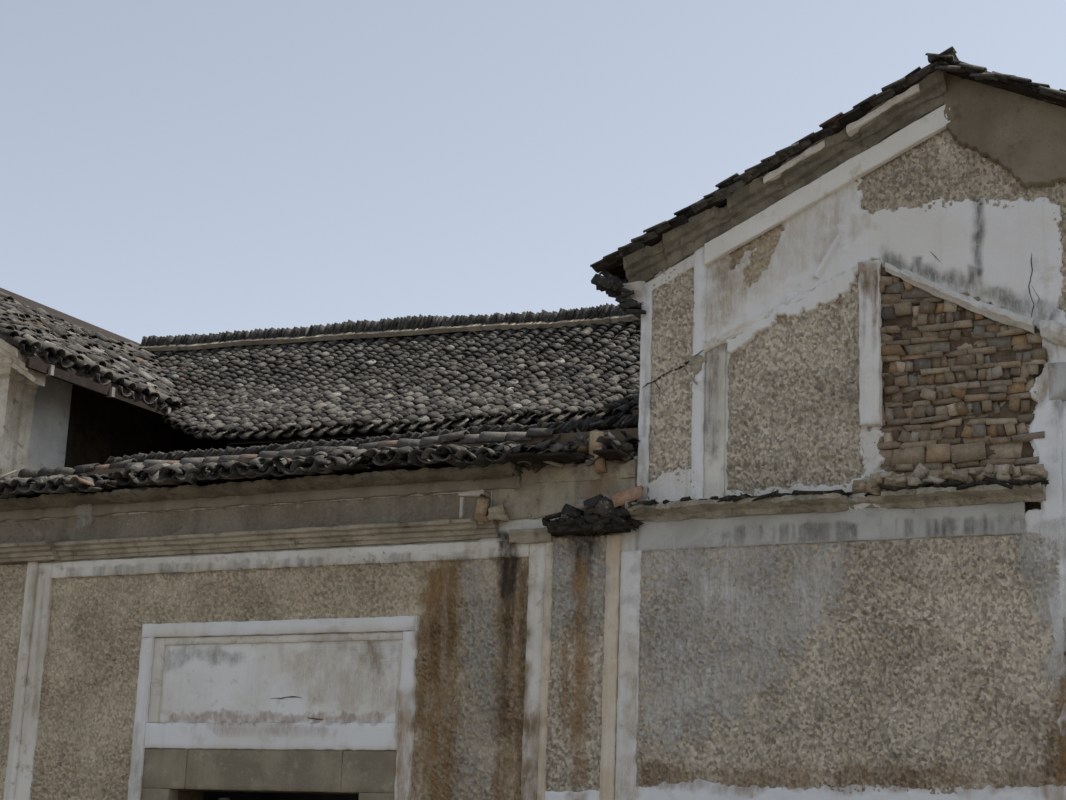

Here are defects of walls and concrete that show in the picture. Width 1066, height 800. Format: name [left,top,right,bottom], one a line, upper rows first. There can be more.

flaking render [729,224,785,290]
flaking render [855,74,1066,316]
peeling [560,467,697,520]
flaking render [725,266,1048,510]
water stain [415,562,459,800]
water stain [493,532,537,800]